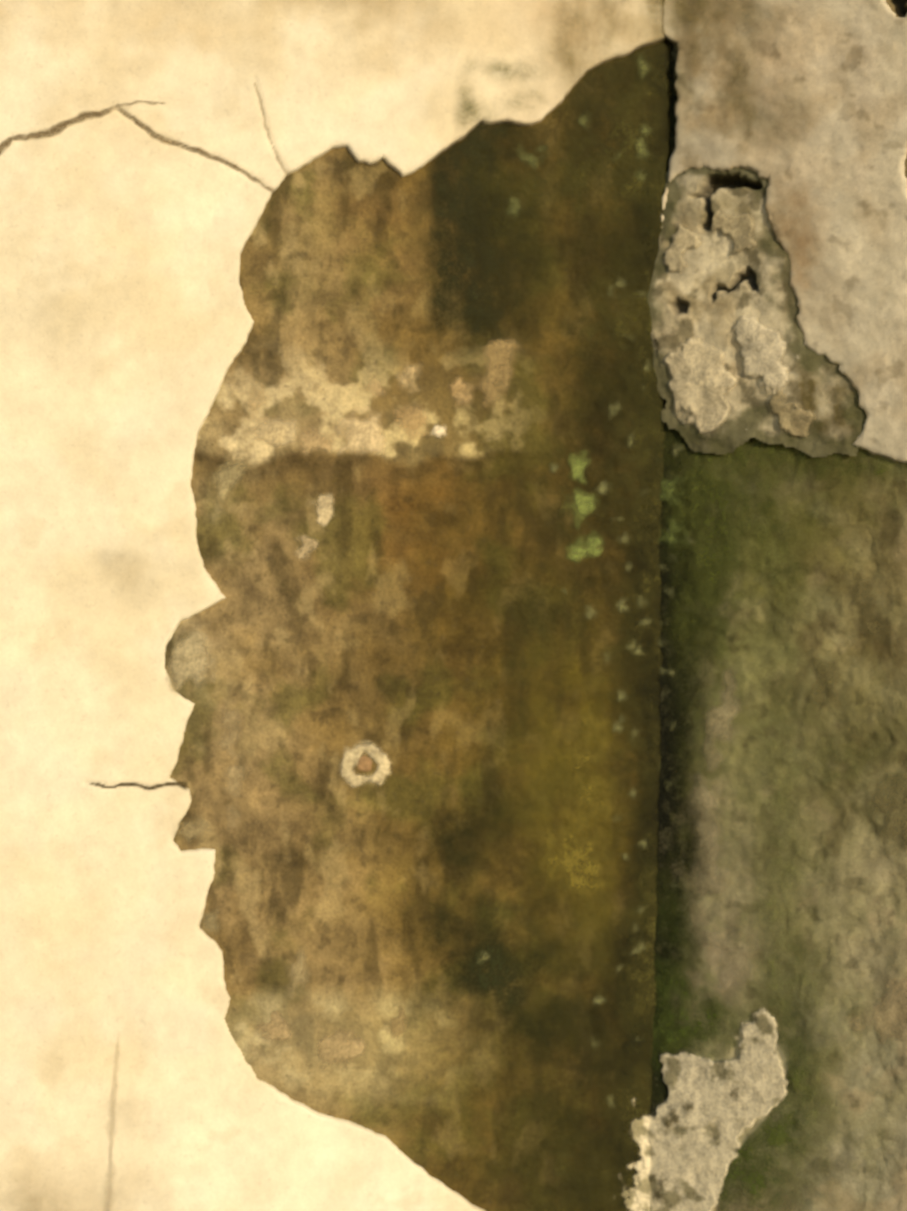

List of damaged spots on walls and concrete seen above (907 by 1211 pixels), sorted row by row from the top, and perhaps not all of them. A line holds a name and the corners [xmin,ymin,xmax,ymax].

spalling [886,0,907,18]
crack [0,102,272,190]
spalling [165,40,907,1211]
crack [91,782,187,790]